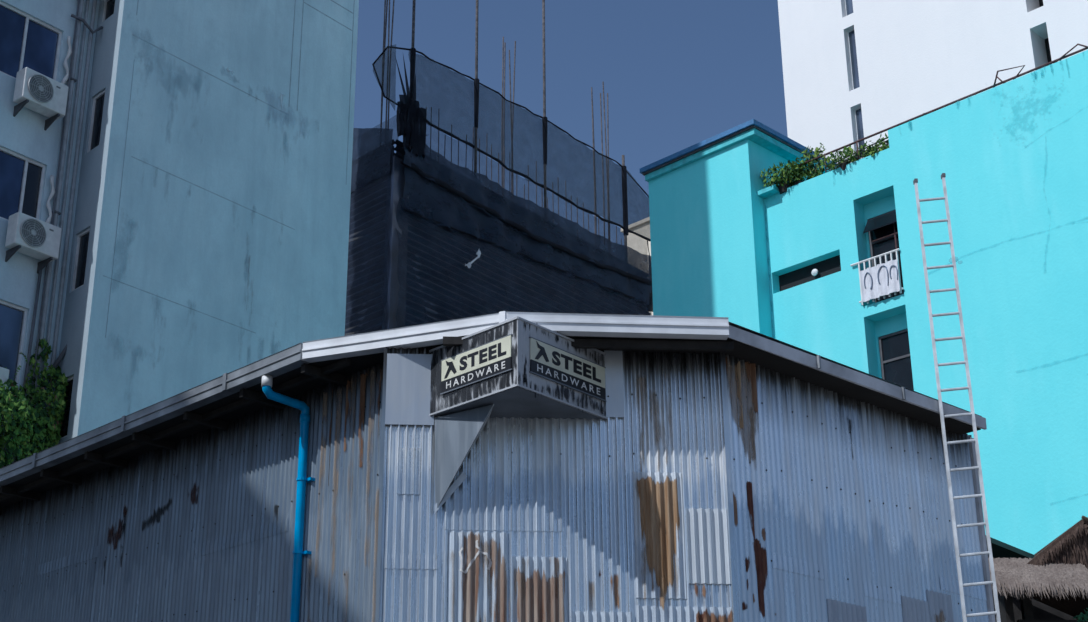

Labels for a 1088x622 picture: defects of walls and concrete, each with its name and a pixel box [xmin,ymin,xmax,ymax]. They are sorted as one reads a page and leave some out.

rust [725,357,759,461]
rust [107,506,127,550]
rust [453,531,565,622]
rust [637,377,680,610]
rust [695,481,776,622]